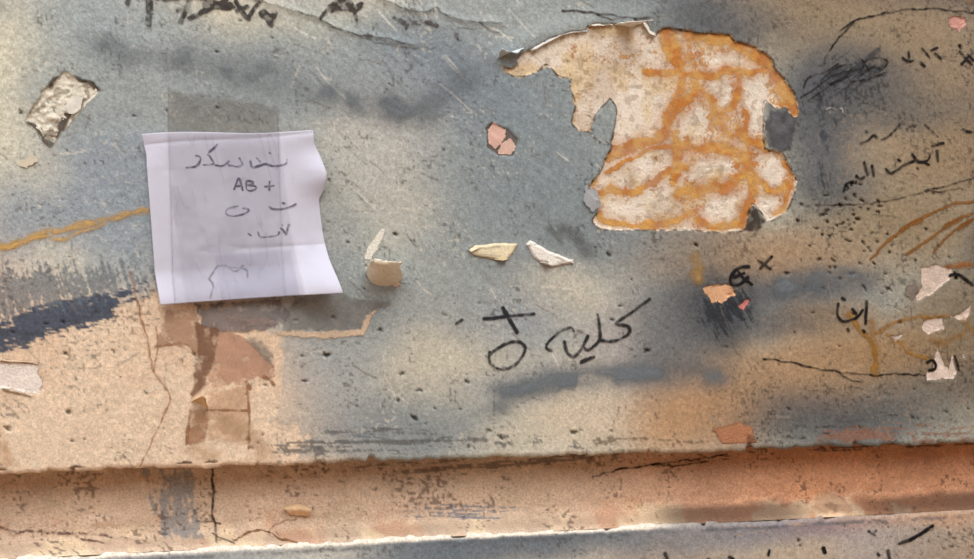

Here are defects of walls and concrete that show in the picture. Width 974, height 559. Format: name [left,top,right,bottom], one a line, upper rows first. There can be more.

spalling [25,71,100,147]
peeling [486,122,517,155]
peeling [498,19,799,233]
peeling [703,284,749,310]
peeling [905,265,954,301]
peeling [0,359,42,397]
crack [136,300,171,422]
crack [763,358,926,382]
peeling [926,349,965,380]
crack [211,468,297,544]